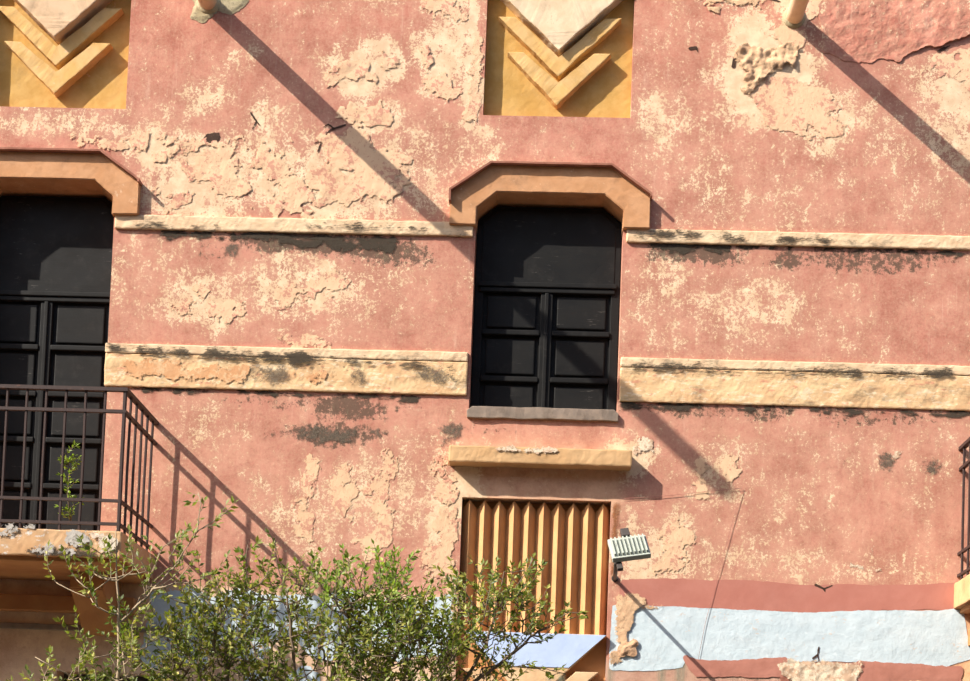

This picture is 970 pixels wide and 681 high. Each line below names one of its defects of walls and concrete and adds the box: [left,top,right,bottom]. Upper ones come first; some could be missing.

peeling [703,0,768,13]
peeling [734,0,848,140]
damp [135,221,426,257]
mould [621,359,739,373]
mould [755,365,954,379]
damp [620,402,704,413]
damp [731,405,867,417]
damp [900,410,970,418]
peeling [0,522,35,536]
peeling [32,529,118,556]
peeling [609,592,662,665]
peeling [683,655,963,681]